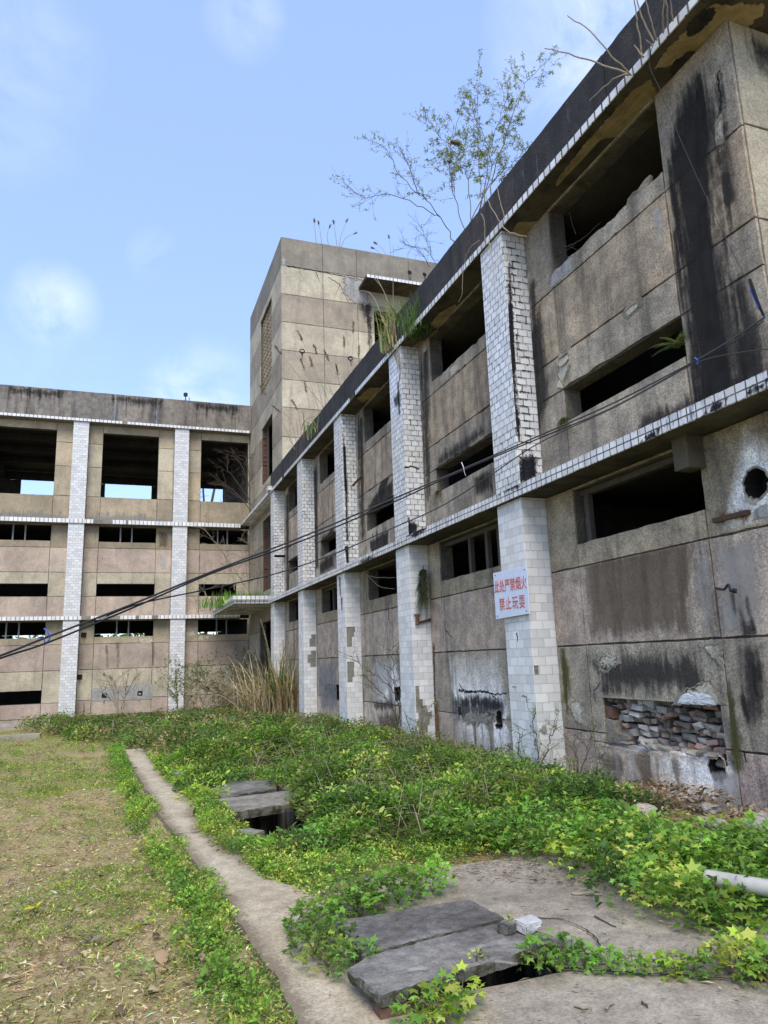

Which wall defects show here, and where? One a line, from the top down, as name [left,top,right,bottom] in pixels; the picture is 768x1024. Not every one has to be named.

leakage [641,72,768,442]
peeling [342,273,369,305]
leakage [468,247,548,495]
leakage [8,387,64,400]
leakage [112,395,163,410]
leakage [197,403,238,415]
peeling [308,635,316,667]
peeling [346,627,355,647]
crack [433,630,527,737]
leakage [593,653,701,693]
peeling [415,686,432,735]
leakage [455,696,504,753]